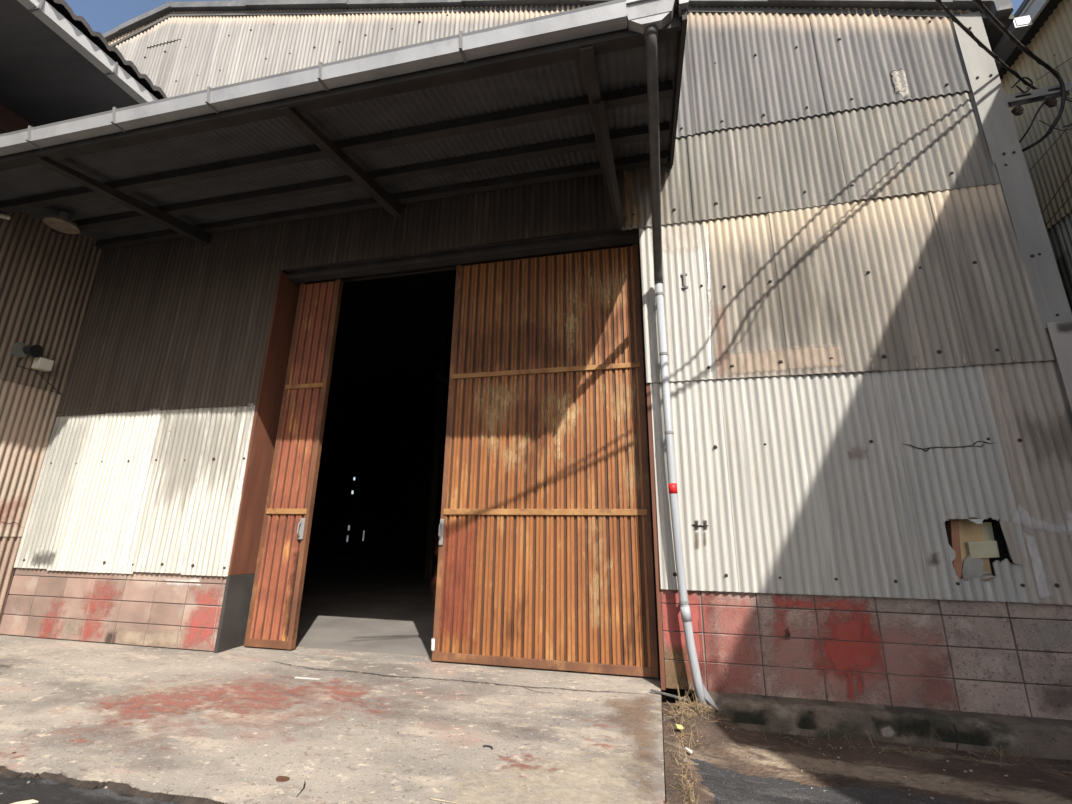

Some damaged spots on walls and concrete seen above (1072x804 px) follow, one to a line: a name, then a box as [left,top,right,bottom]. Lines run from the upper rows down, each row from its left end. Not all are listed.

rust [285,554,299,636]
peeling [944,507,1072,598]